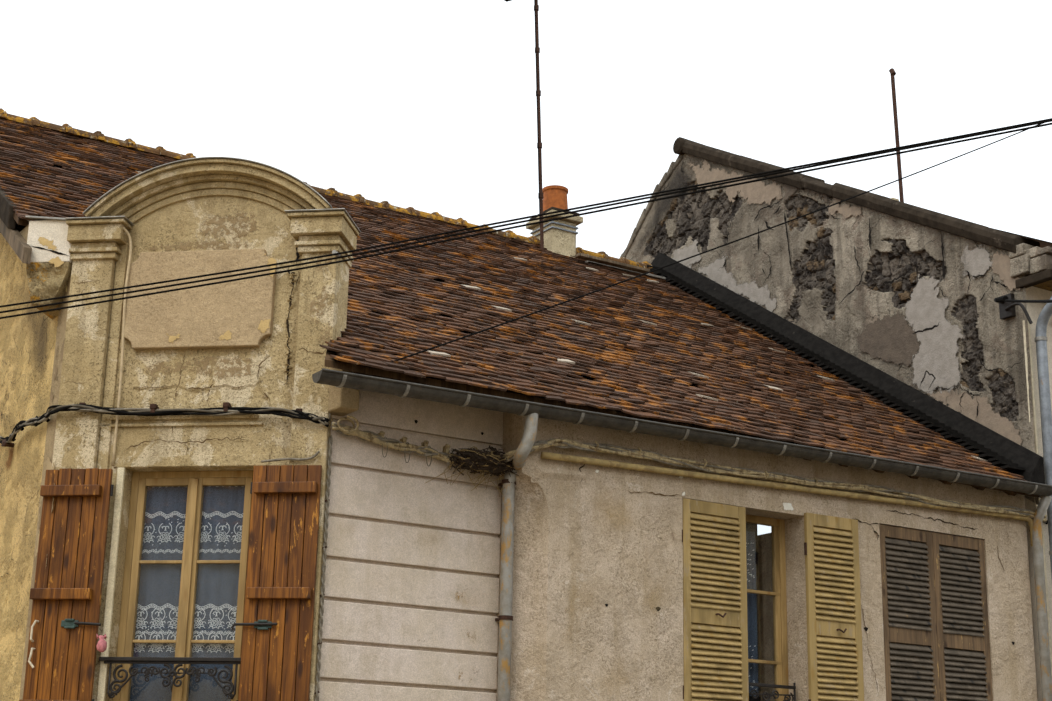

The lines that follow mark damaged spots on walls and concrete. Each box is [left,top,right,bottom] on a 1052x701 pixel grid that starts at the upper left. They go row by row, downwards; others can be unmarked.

crack [124,240,324,459]
peeling [258,319,271,333]
spalling [644,181,743,258]
crack [719,202,792,280]
spalling [784,194,836,323]
spalling [856,239,947,366]
spalling [951,295,1019,421]